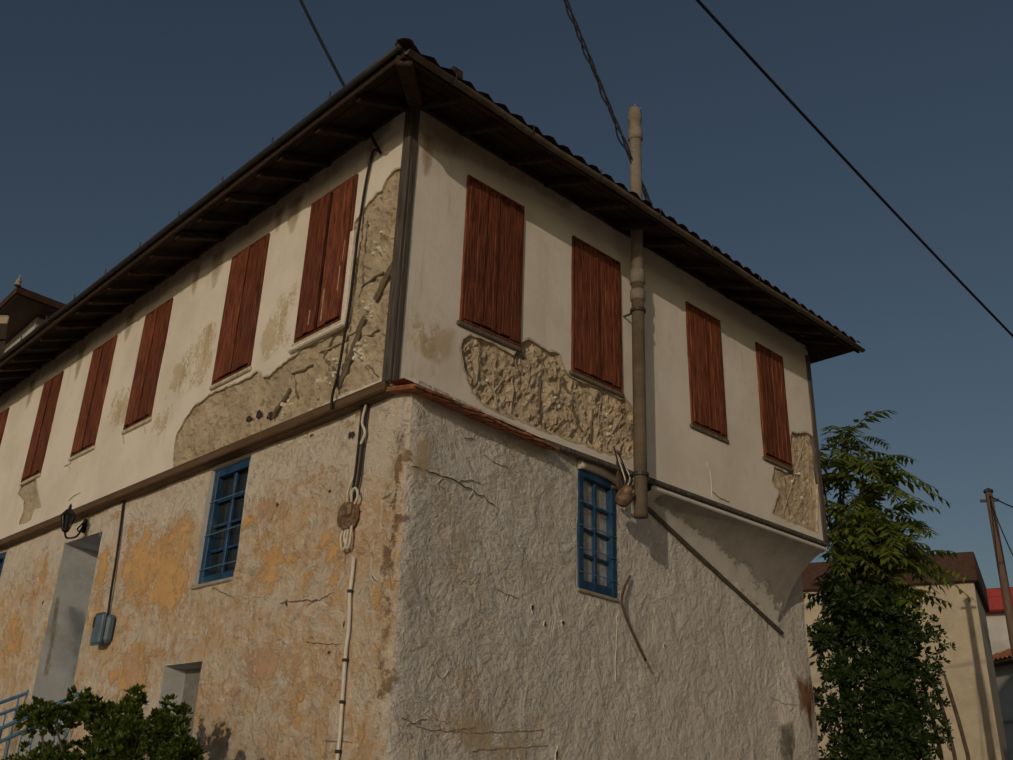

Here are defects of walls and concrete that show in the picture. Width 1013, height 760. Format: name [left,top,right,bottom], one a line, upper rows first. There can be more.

spalling [173,167,401,467]
spalling [459,333,633,460]
spalling [18,478,41,525]
crack [411,465,499,511]
spalling [771,431,819,533]
crack [280,593,331,605]
peeling [655,494,825,615]
crack [401,718,546,751]